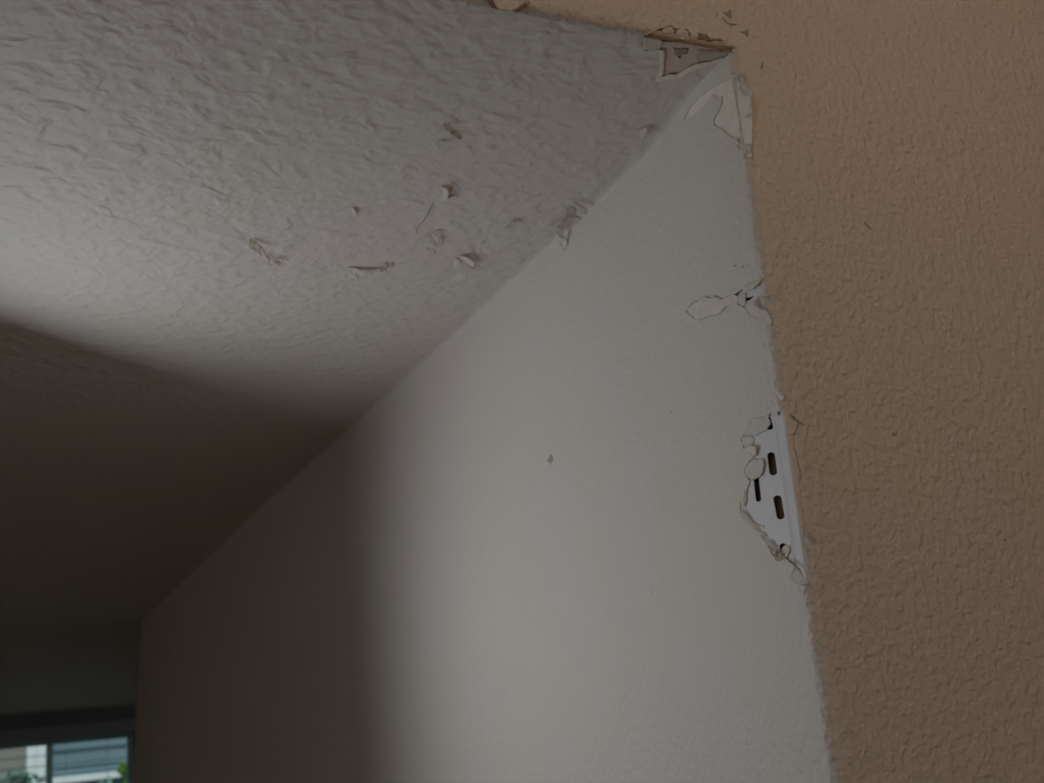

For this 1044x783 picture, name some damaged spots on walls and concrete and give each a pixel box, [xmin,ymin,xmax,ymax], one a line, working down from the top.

flaking render [642,24,735,83]
peeling [685,71,754,157]
peeling [686,278,772,325]
peeling [740,409,817,585]